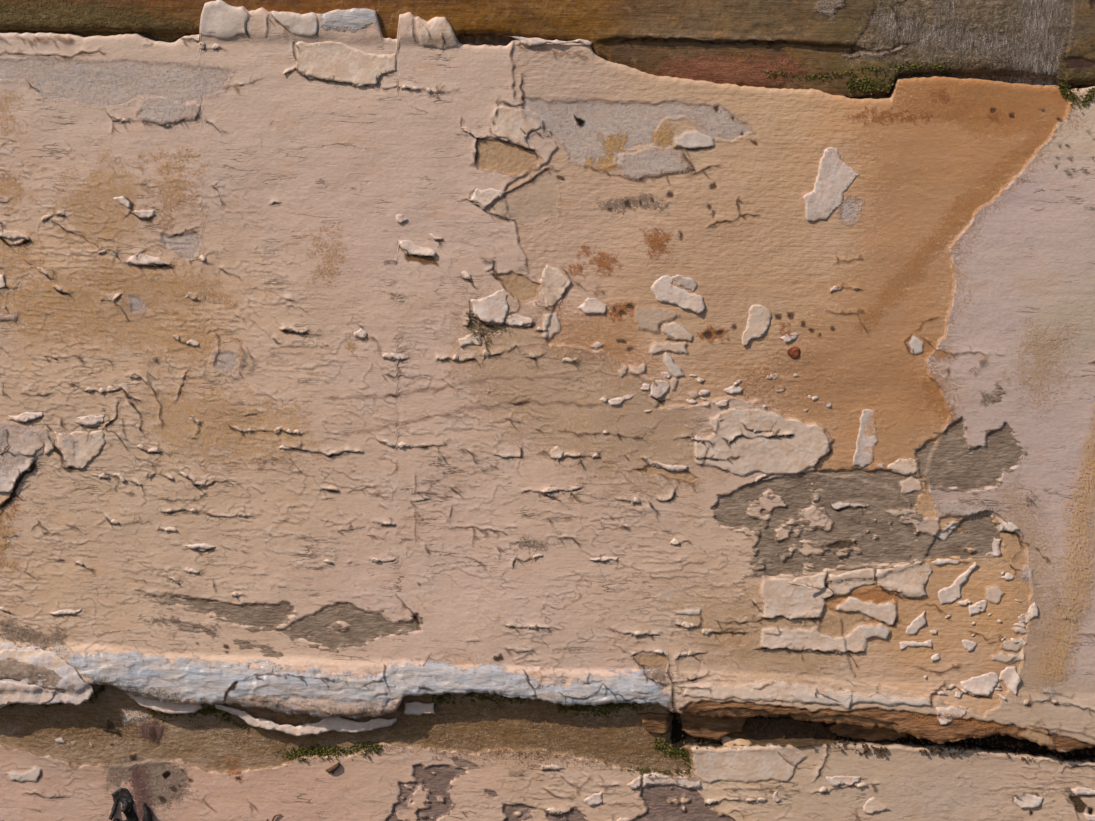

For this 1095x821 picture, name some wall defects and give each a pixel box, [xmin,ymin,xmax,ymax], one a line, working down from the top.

peeling [113,196,156,221]
crack [0,201,172,296]
peeling [127,228,227,277]
peeling [383,233,443,265]
crack [273,299,307,342]
peeling [456,36,1095,752]
crack [2,355,252,532]
crack [675,426,740,469]
crack [228,413,676,568]
peeling [135,589,422,657]
crack [473,624,556,661]
peeling [0,641,807,821]